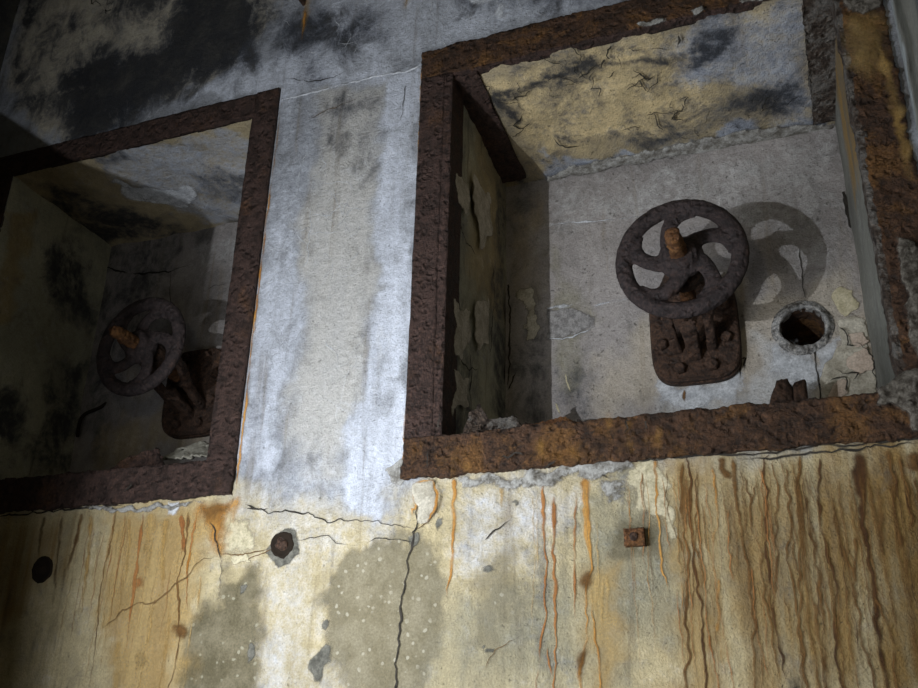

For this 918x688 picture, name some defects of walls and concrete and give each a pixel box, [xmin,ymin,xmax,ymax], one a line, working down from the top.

peeling [456,173,493,250]
peeling [451,298,490,416]
peeling [820,287,918,430]
spalling [897,237,918,356]
rust [71,500,238,688]
crack [108,523,271,624]
damp [177,566,264,688]
crack [247,505,437,688]
damp [321,533,443,688]
rust [537,488,557,688]
rust [573,478,617,688]
rust [640,451,918,688]